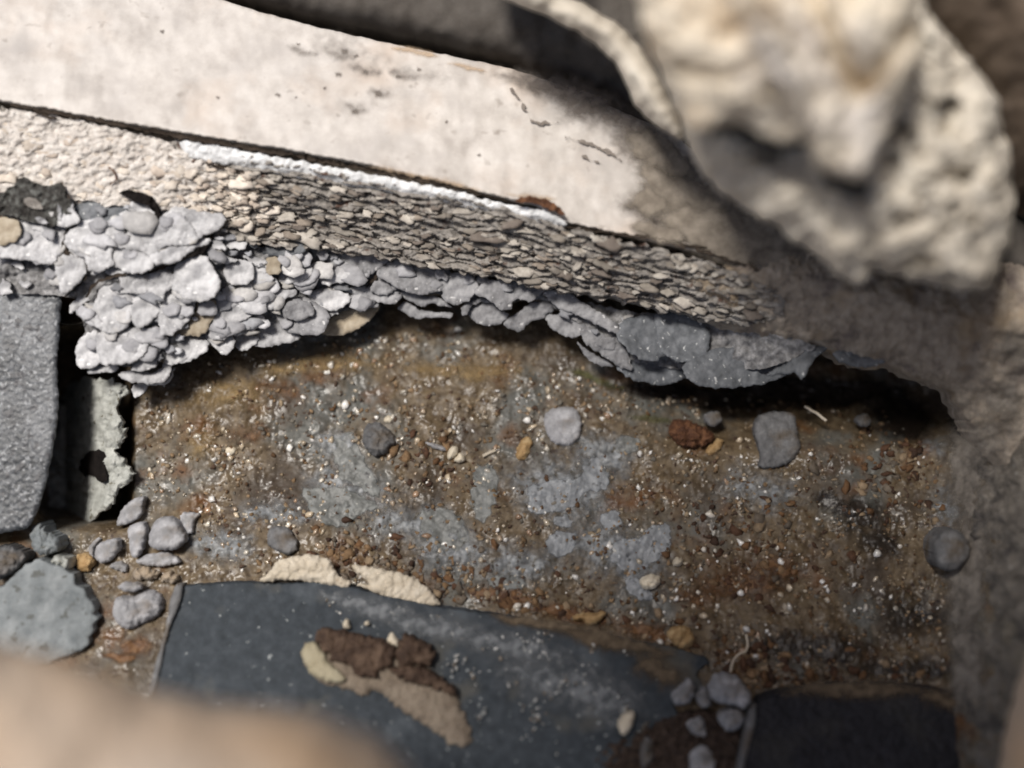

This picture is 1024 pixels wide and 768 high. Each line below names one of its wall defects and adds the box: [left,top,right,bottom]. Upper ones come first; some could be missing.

peeling [0,106,885,527]